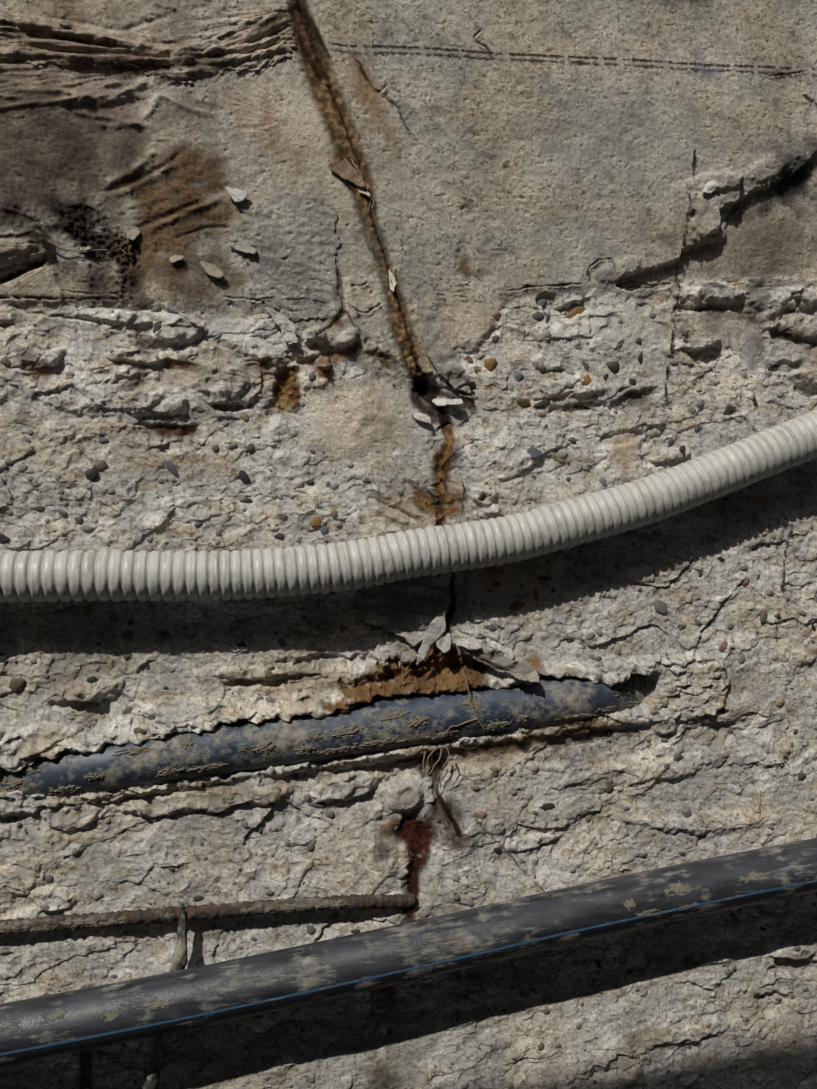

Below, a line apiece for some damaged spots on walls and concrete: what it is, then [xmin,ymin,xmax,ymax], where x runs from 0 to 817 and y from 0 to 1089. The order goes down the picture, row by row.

peeling [0,1,297,84]
spalling [0,187,398,448]
rust [308,351,358,375]
crack [226,0,474,527]
rust [373,351,393,366]
spalling [411,154,817,439]
rust [414,489,462,522]
crack [443,572,456,634]
spalling [0,693,335,770]
rust [0,801,463,935]